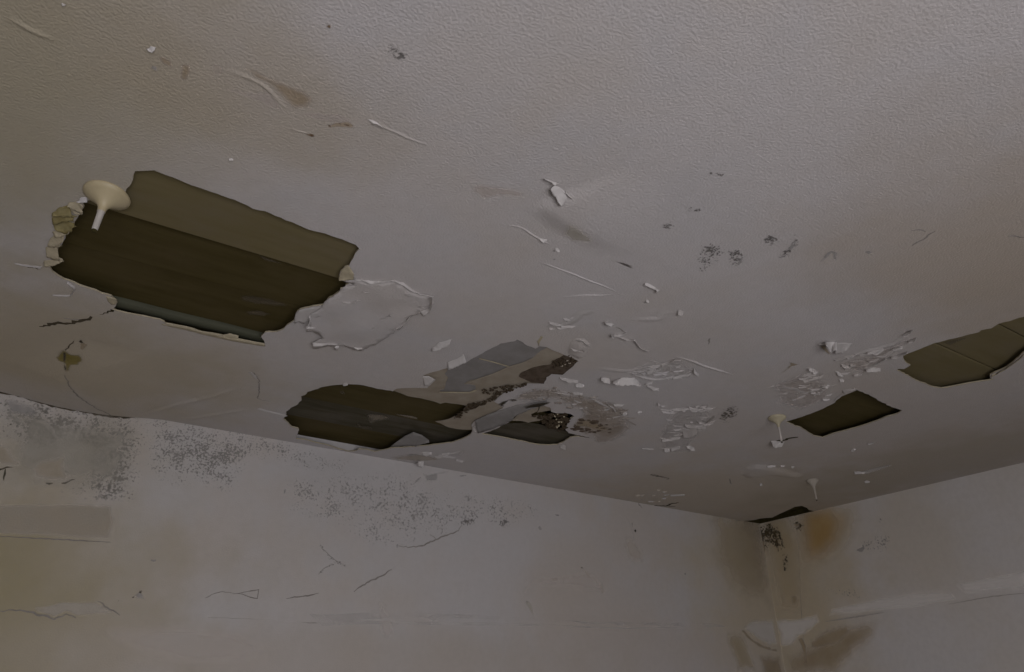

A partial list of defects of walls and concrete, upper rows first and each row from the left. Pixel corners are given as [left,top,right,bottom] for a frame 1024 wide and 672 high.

peeling [306,278,434,351]
spalling [394,317,642,441]
peeling [601,377,652,387]
leakage [0,400,142,499]
leakage [153,422,325,484]
leakage [722,511,849,605]
leakage [793,628,871,670]